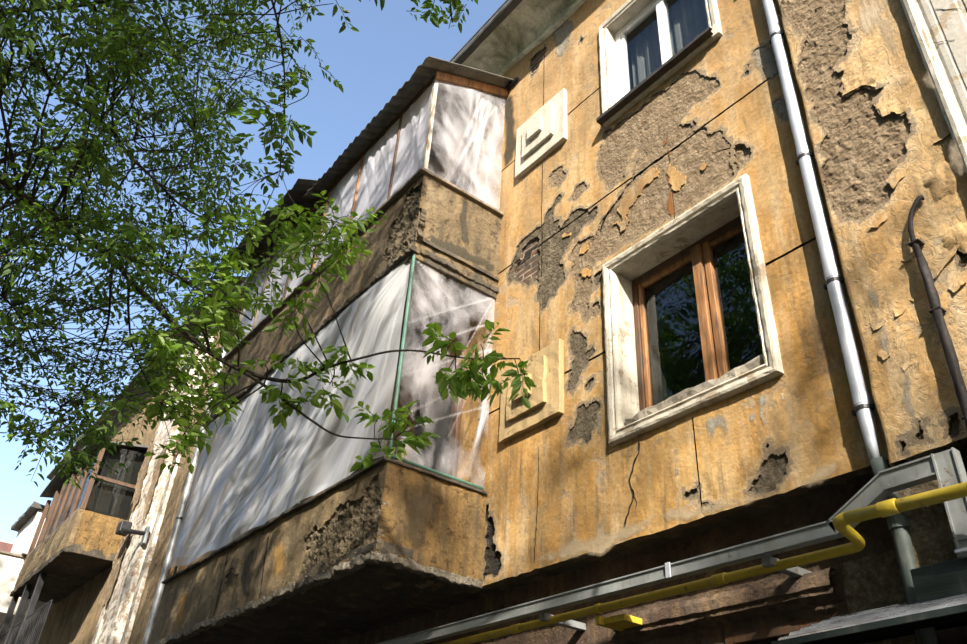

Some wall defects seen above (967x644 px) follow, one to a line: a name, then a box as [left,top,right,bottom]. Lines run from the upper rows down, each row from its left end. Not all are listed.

spalling [530,22,584,75]
spalling [744,46,778,80]
spalling [773,99,788,119]
spalling [778,0,911,228]
spalling [383,181,427,260]
spalling [508,70,752,320]
spalling [567,330,595,391]
spalling [568,400,601,443]
spalling [302,464,389,576]
spalling [483,504,502,579]
crack [623,442,640,540]
spalling [748,443,788,494]